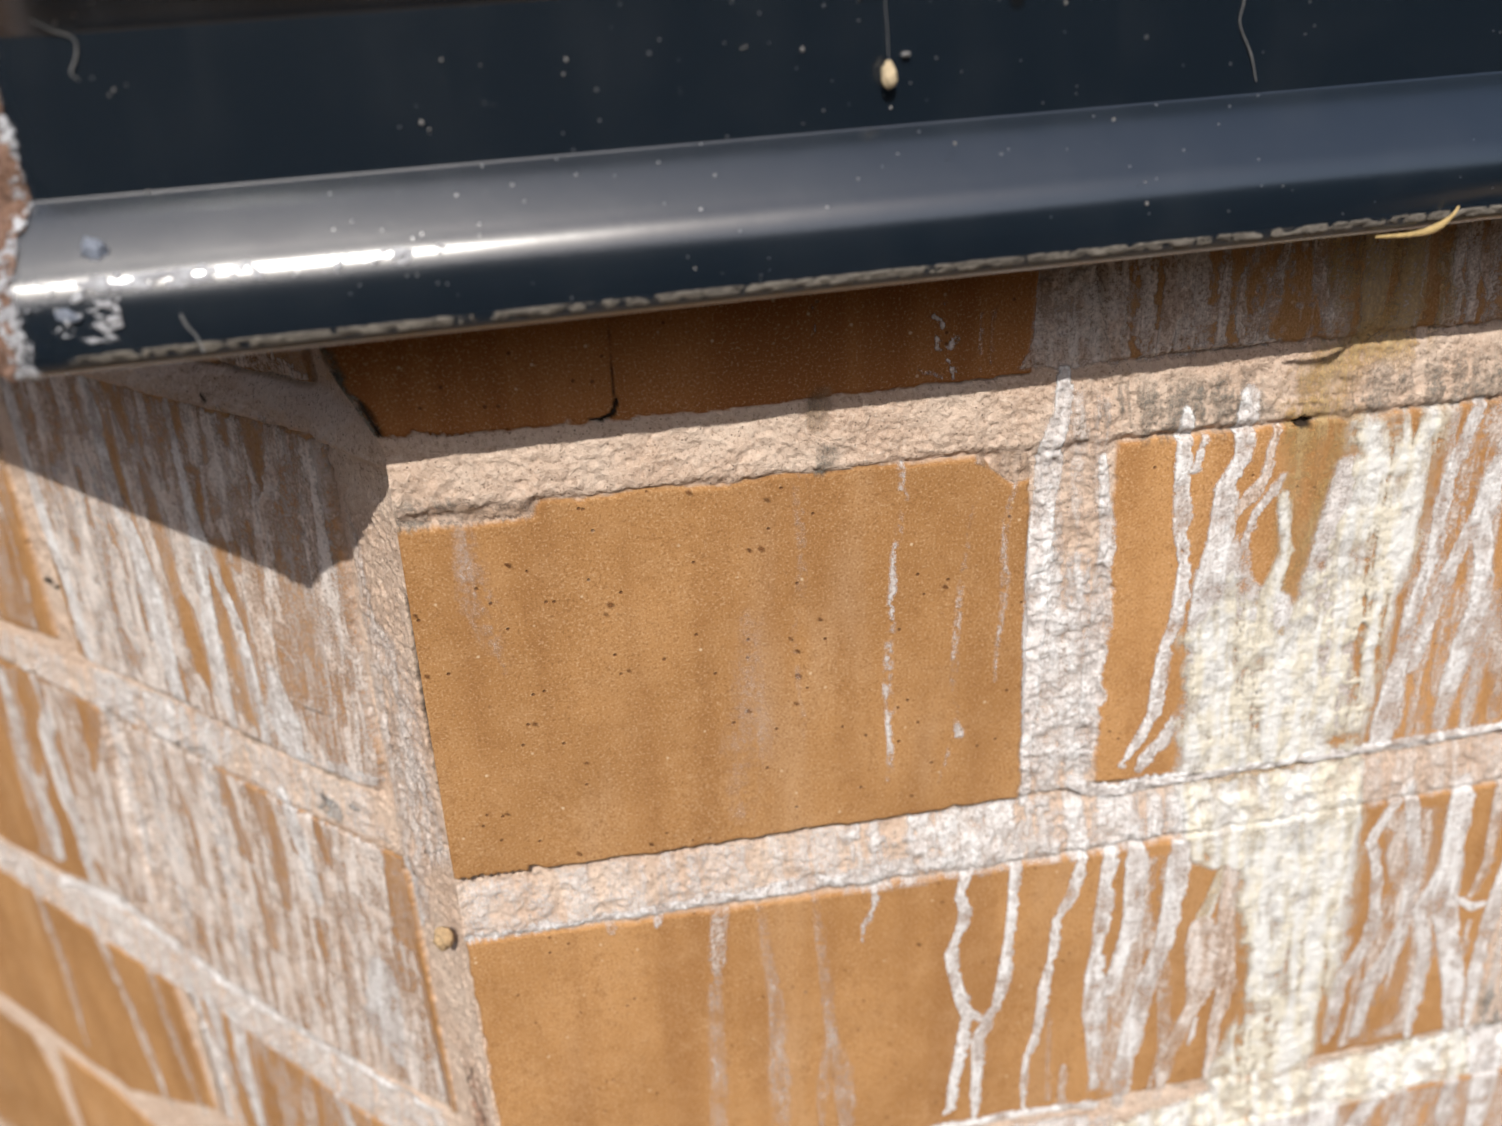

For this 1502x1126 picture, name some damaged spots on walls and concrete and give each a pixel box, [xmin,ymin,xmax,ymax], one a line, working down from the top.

water stain [0,374,448,1126]
crack [407,598,432,746]
crack [589,365,618,422]
water stain [464,219,1502,1126]